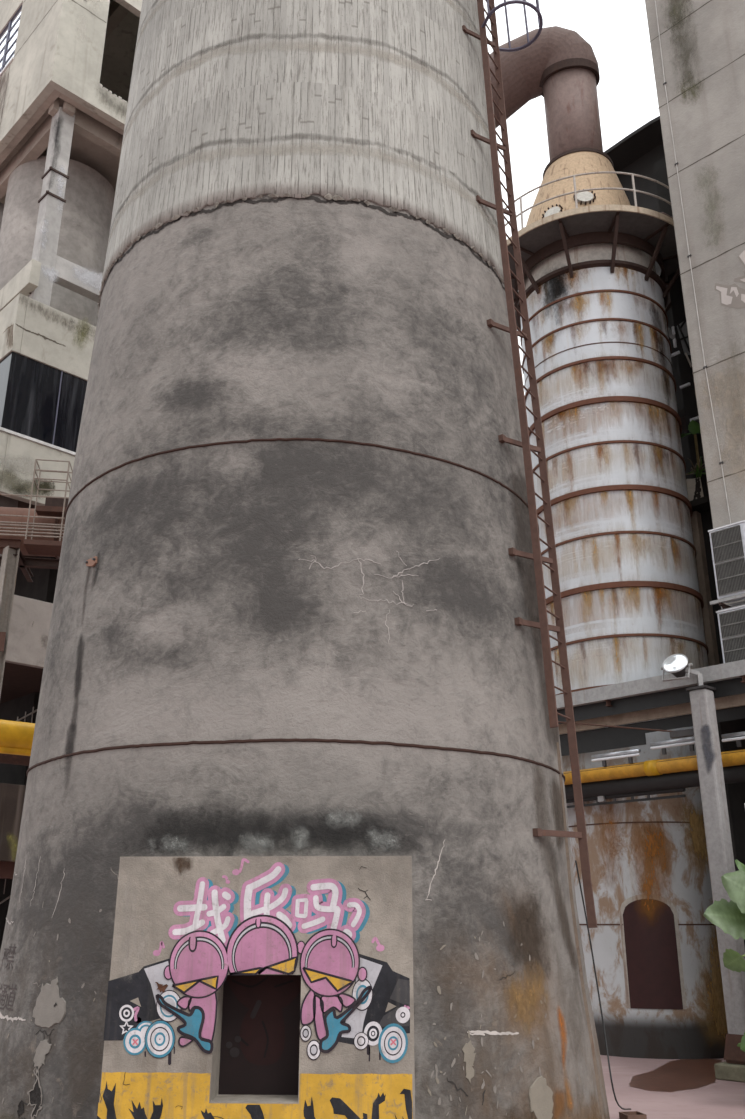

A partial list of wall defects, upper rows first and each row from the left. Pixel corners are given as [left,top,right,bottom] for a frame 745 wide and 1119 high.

corrosion [619,305,680,430]
water stain [65,637,82,757]
corrosion [636,826,668,916]
corrosion [685,809,708,862]
corrosion [706,930,728,1038]
peeling [17,977,66,1119]
peeling [529,1067,554,1119]